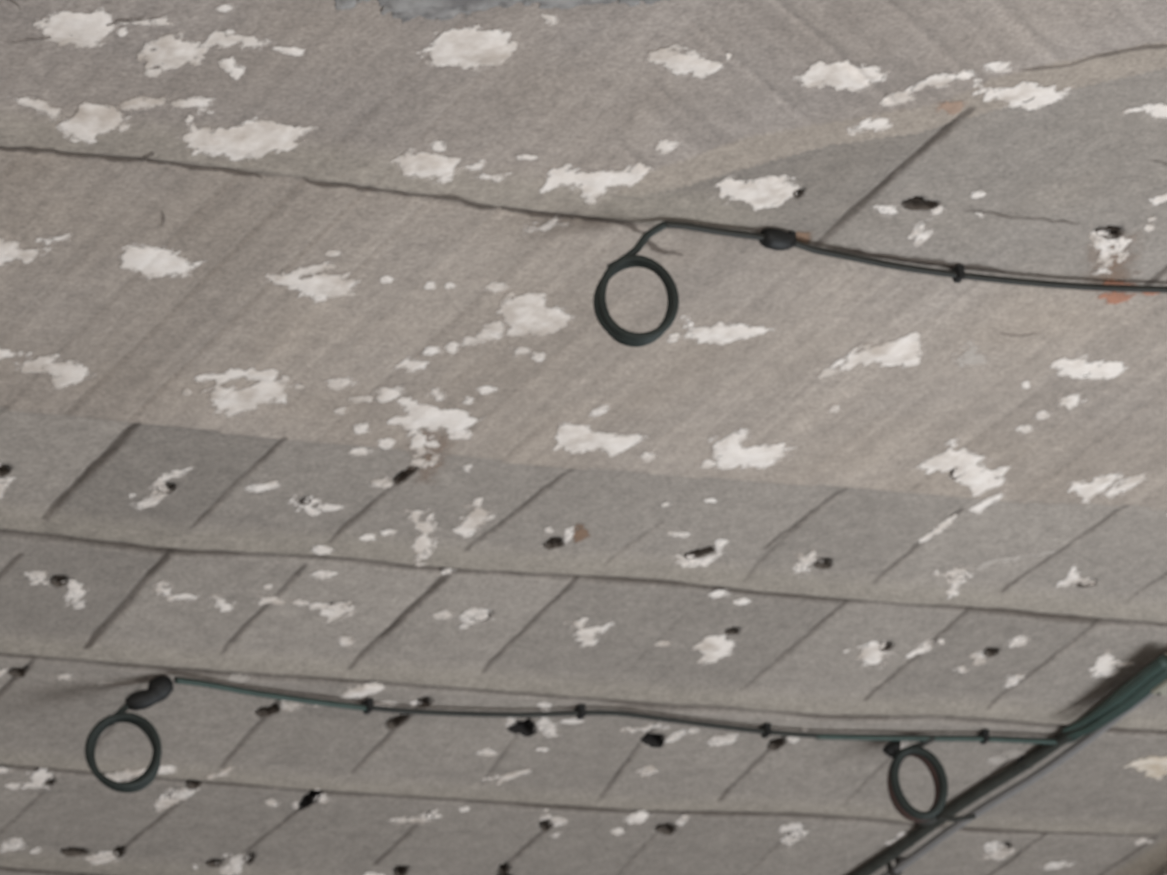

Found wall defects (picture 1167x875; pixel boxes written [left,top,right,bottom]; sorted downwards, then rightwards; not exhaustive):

spalling [1123,97,1167,118]
spalling [7,95,313,161]
spalling [655,139,679,154]
spalling [539,162,654,206]
rust [1099,280,1160,304]
spalling [505,702,585,752]
spalling [620,723,739,748]
spalling [476,748,498,757]
spalling [483,769,531,785]
spalling [1122,756,1167,781]
spalling [364,866,407,875]
spalling [498,863,510,875]